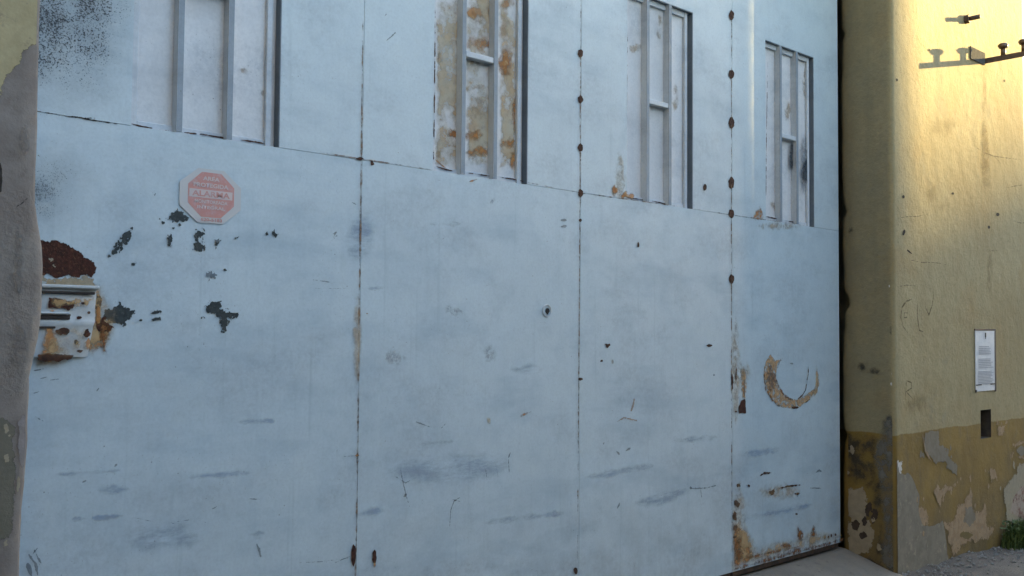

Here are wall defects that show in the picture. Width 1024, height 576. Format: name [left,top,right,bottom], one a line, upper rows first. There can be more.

peeling [0,0,37,95]
rust [433,0,534,184]
rust [721,10,737,255]
rust [41,240,96,278]
peeling [108,227,133,257]
peeling [159,209,221,252]
rust [34,290,110,379]
peeling [95,302,162,351]
peeling [201,300,239,333]
rust [764,355,819,409]
rust [733,500,844,569]
spalling [847,487,882,555]